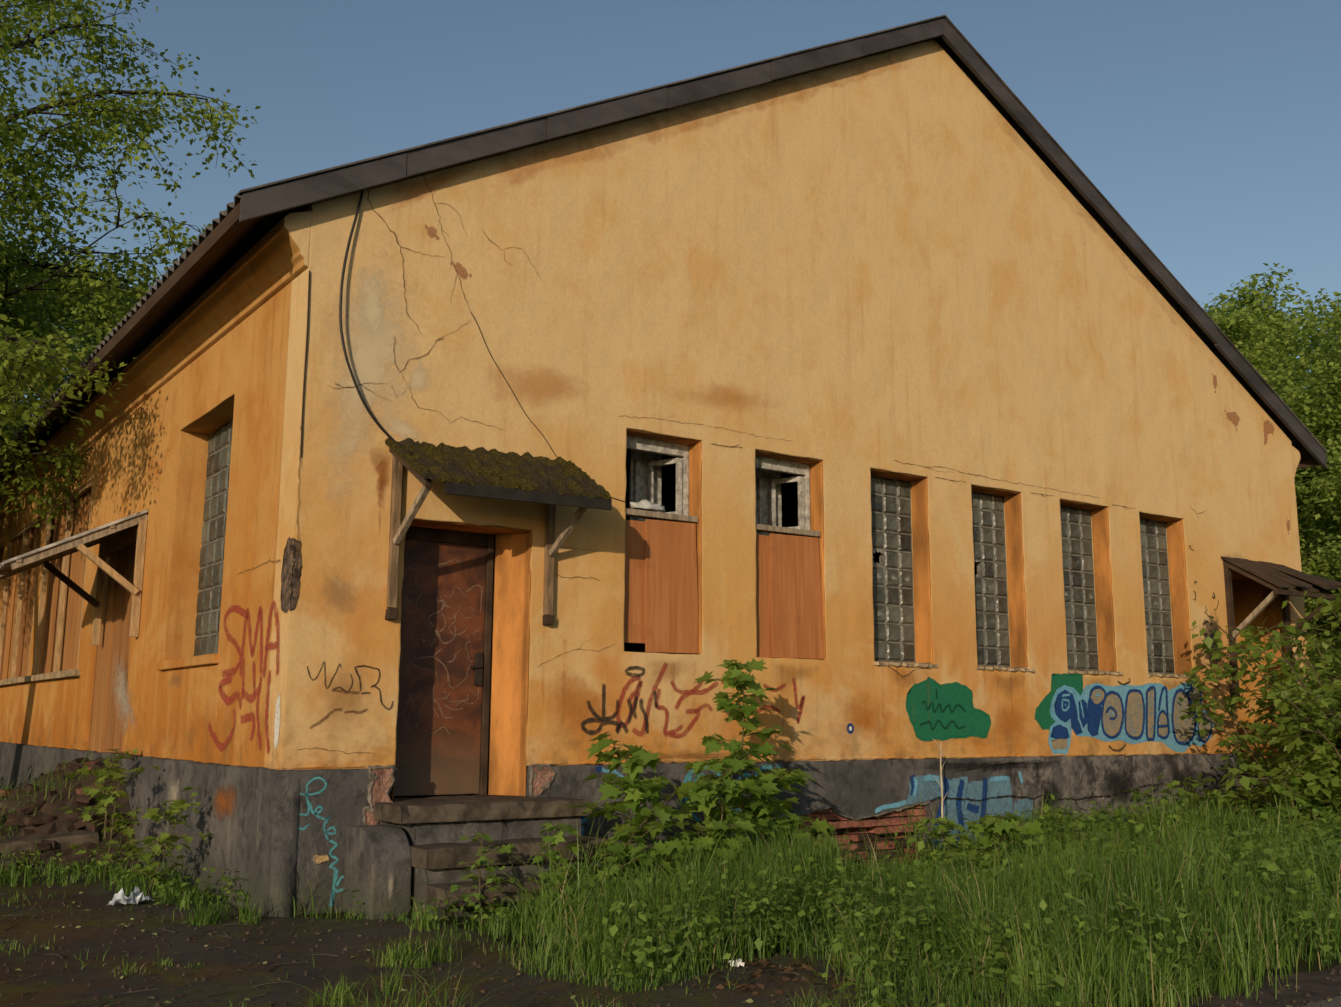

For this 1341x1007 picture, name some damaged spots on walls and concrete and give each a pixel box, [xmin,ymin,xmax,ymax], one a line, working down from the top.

crack [330,189,541,430]
flaking render [774,800,932,867]